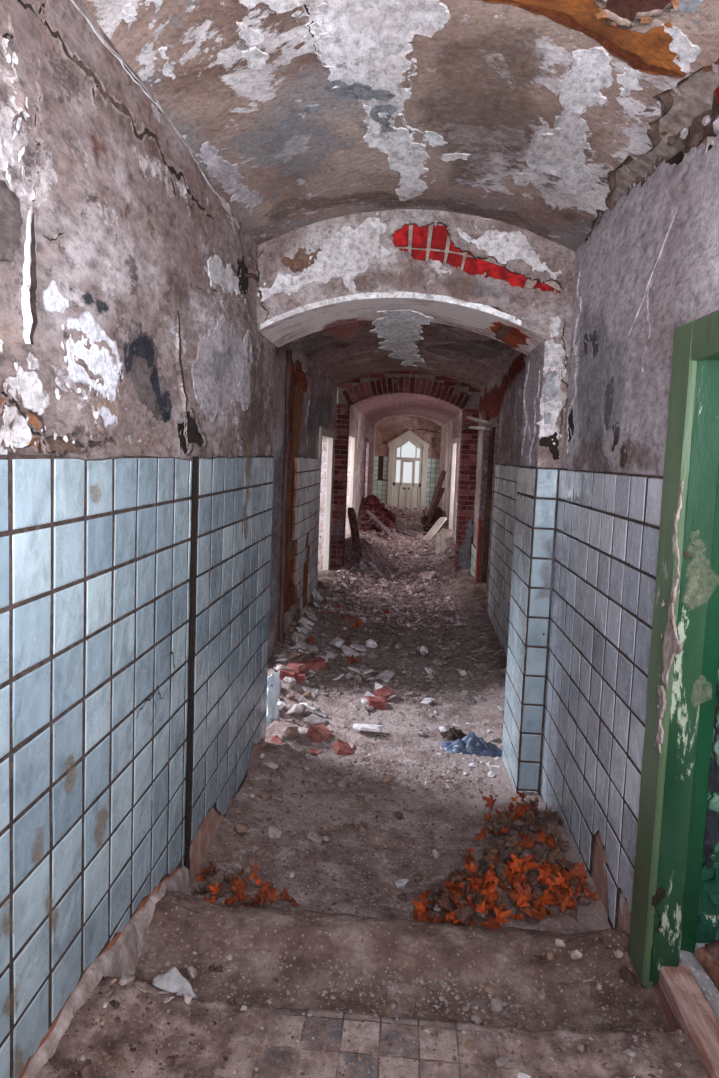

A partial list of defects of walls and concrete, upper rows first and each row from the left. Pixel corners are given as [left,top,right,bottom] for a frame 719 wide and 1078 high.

peeling [0,38,30,184]
crack [0,0,240,242]
peeling [145,47,176,83]
peeling [200,142,263,214]
peeling [236,0,470,201]
peeling [511,46,643,195]
flaking render [595,0,703,73]
peeling [207,212,562,302]
water stain [43,281,172,427]
peeling [0,210,253,455]
peeling [370,302,574,460]
peeling [654,481,719,753]